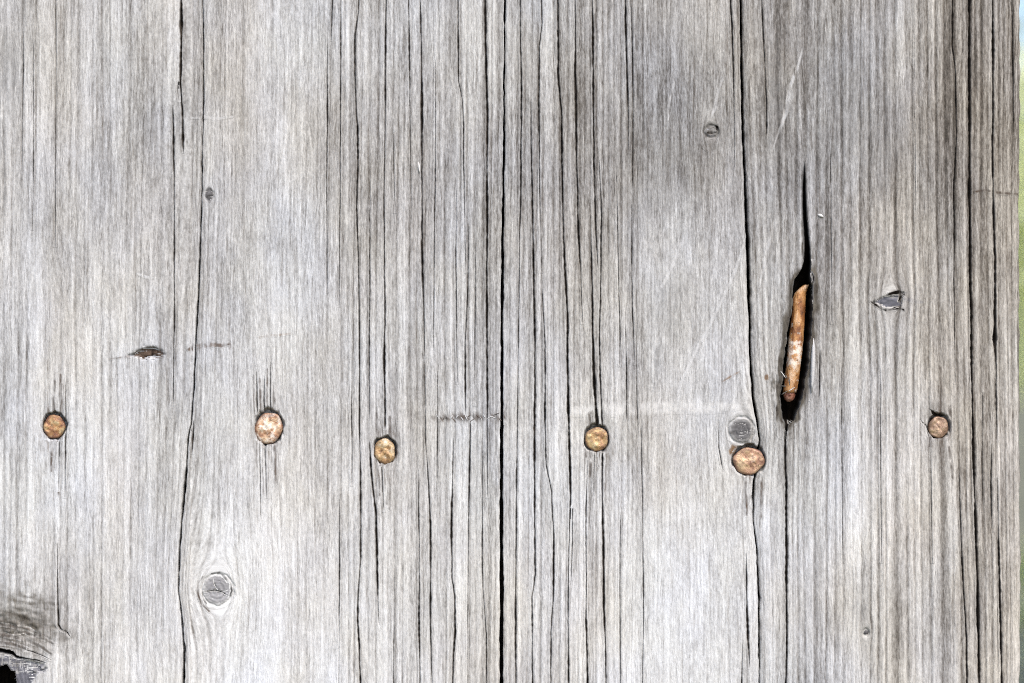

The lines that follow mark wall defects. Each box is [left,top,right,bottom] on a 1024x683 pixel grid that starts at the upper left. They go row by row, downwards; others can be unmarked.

crack [170,0,196,454]
crack [324,0,646,683]
crack [919,0,1016,683]
rust [35,372,71,477]
rust [244,367,289,501]
rust [366,411,405,511]
rust [574,410,618,500]
rust [725,423,771,520]
rust [920,365,956,496]
crack [739,550,752,683]